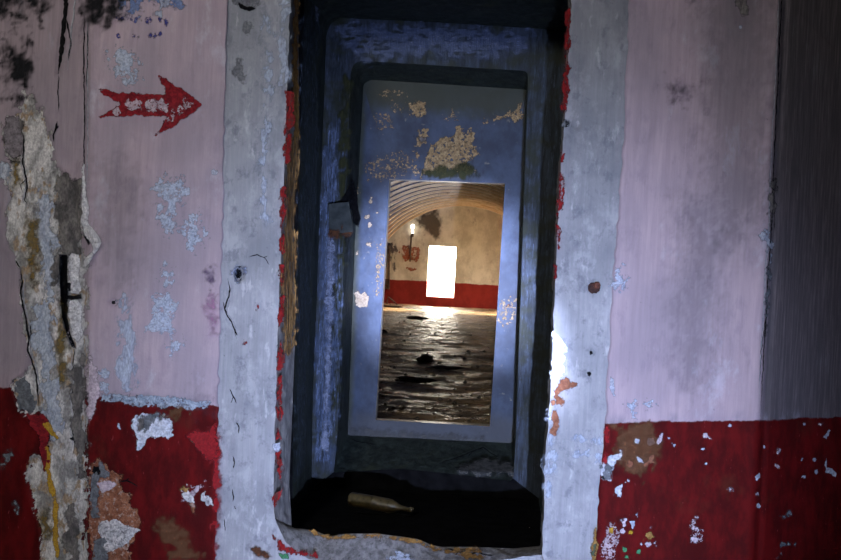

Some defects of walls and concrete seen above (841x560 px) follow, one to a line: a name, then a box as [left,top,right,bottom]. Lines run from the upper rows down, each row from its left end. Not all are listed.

peeling [121,0,185,22]
peeling [374,90,427,130]
peeling [483,102,524,124]
peeling [365,109,480,181]
spalling [328,182,378,228]
crack [16,261,41,403]
spalling [0,90,214,560]
crack [223,281,239,339]
peeling [186,423,221,463]
peeling [600,400,676,497]
peeling [601,514,655,559]
peeling [689,517,703,543]